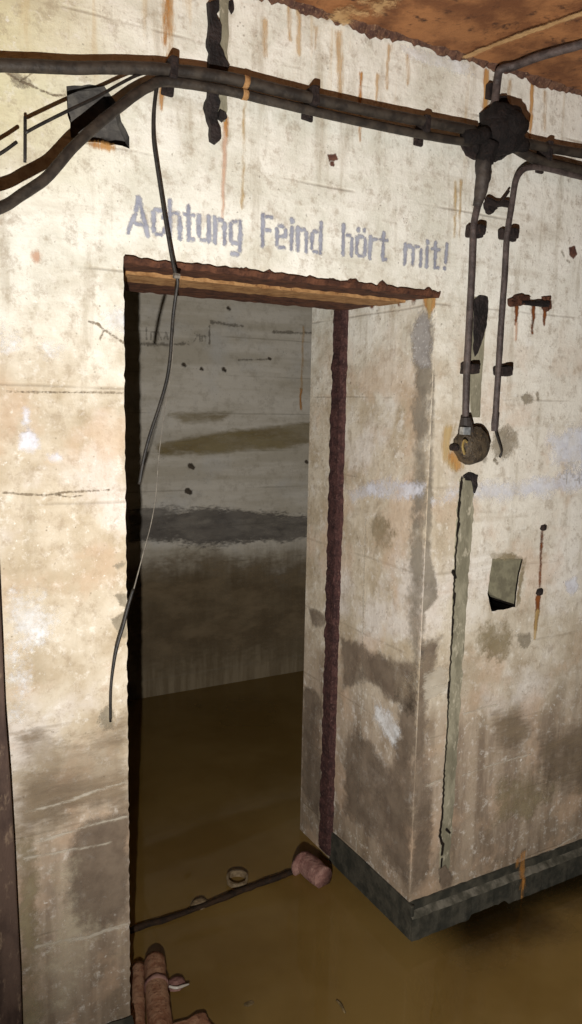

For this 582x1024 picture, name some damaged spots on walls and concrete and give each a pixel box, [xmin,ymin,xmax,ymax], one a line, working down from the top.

rust [164,0,173,43]
rust [241,74,251,101]
rust [259,0,582,139]
rust [515,306,547,340]
leakage [159,424,310,454]
leakage [127,507,307,545]
leakage [341,330,447,886]
rust [534,531,543,639]
crack [438,477,463,883]
leakage [16,773,128,822]
leakage [18,816,129,949]